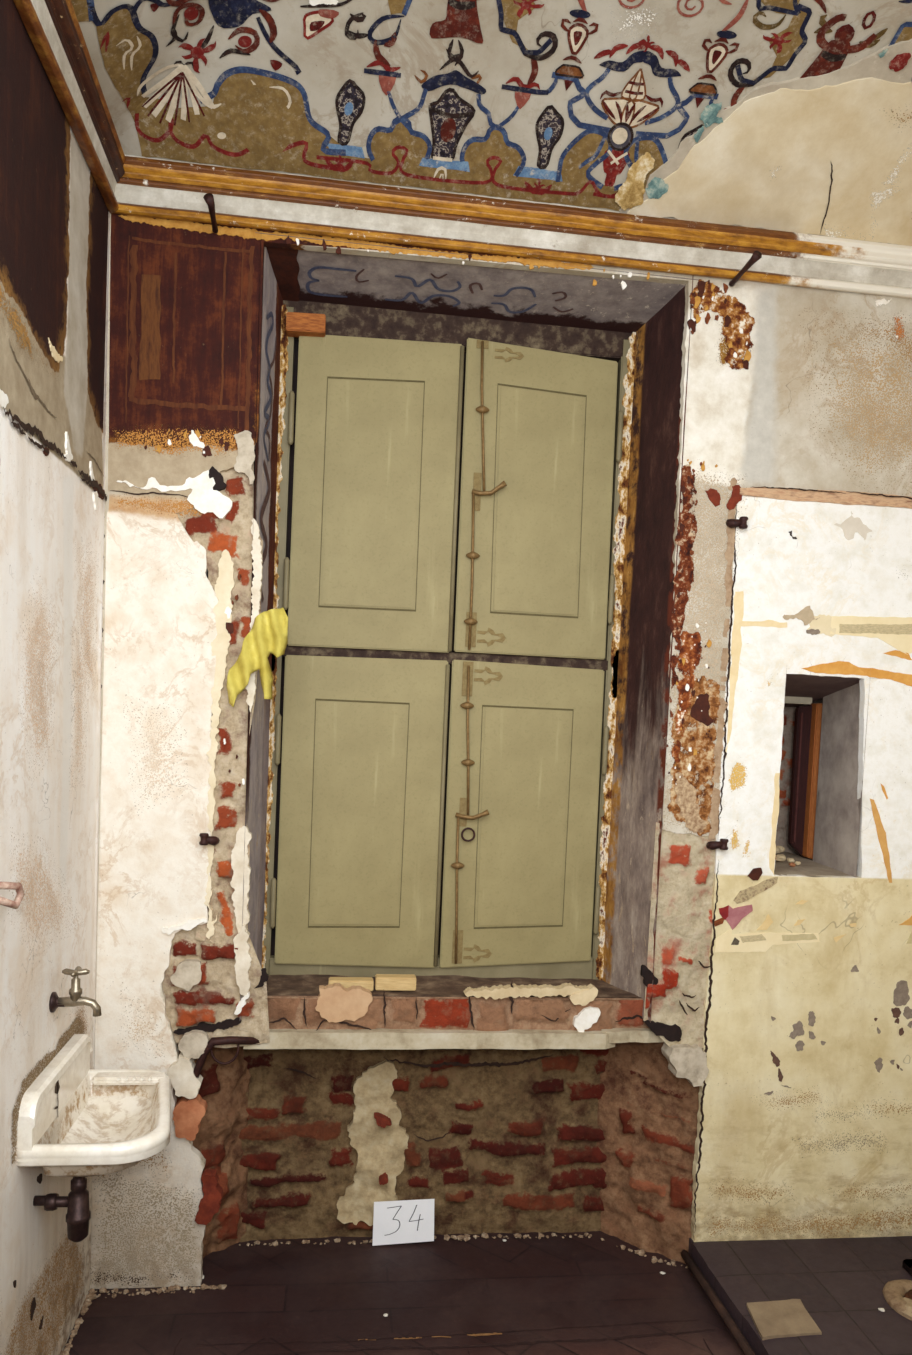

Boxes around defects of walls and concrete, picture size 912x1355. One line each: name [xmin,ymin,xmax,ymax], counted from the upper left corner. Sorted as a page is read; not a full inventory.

flaking render [615,39,912,246]
crack [820,163,833,233]
peeling [687,279,755,370]
spalling [0,389,9,408]
spalling [43,432,73,462]
spalling [89,304,289,1141]
spalling [195,1169,223,1225]